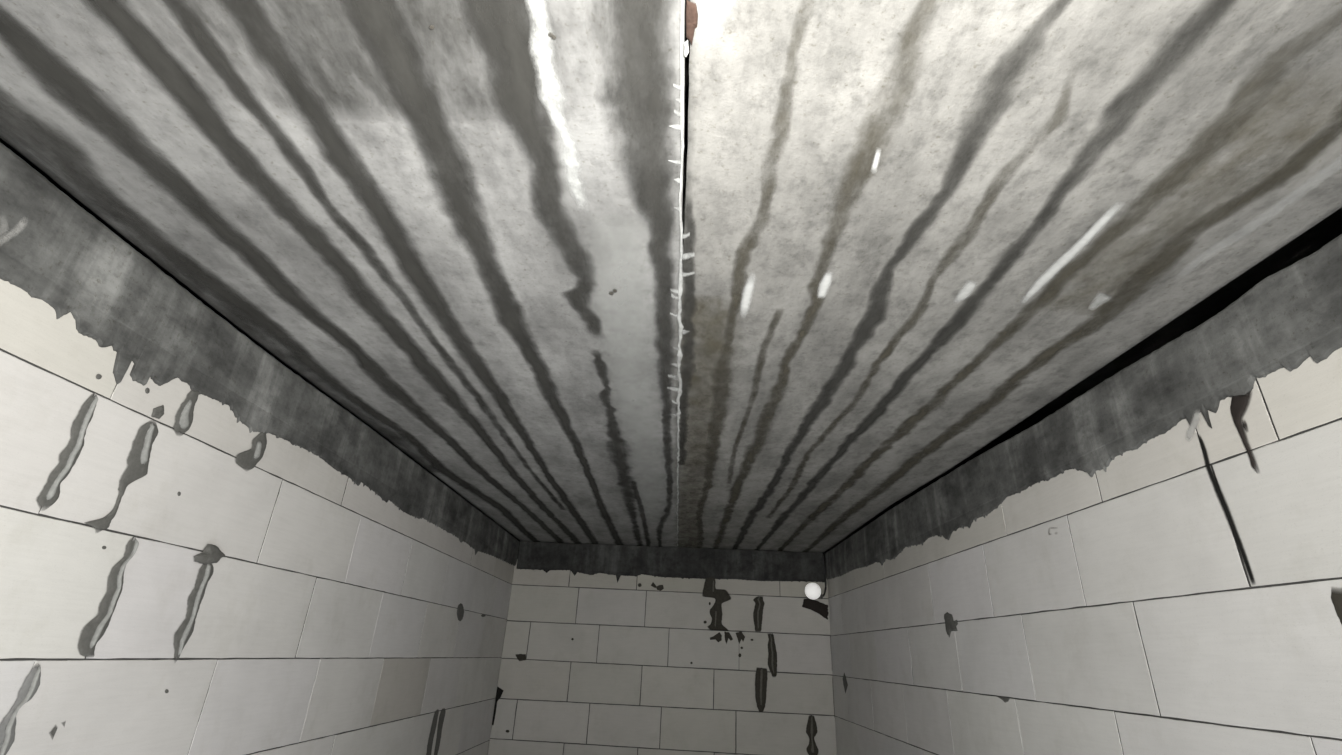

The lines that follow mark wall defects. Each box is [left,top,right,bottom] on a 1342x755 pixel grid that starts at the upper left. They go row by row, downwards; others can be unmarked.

rust [684,0,698,57]
damp [0,0,1342,552]
crack [1198,436,1254,583]